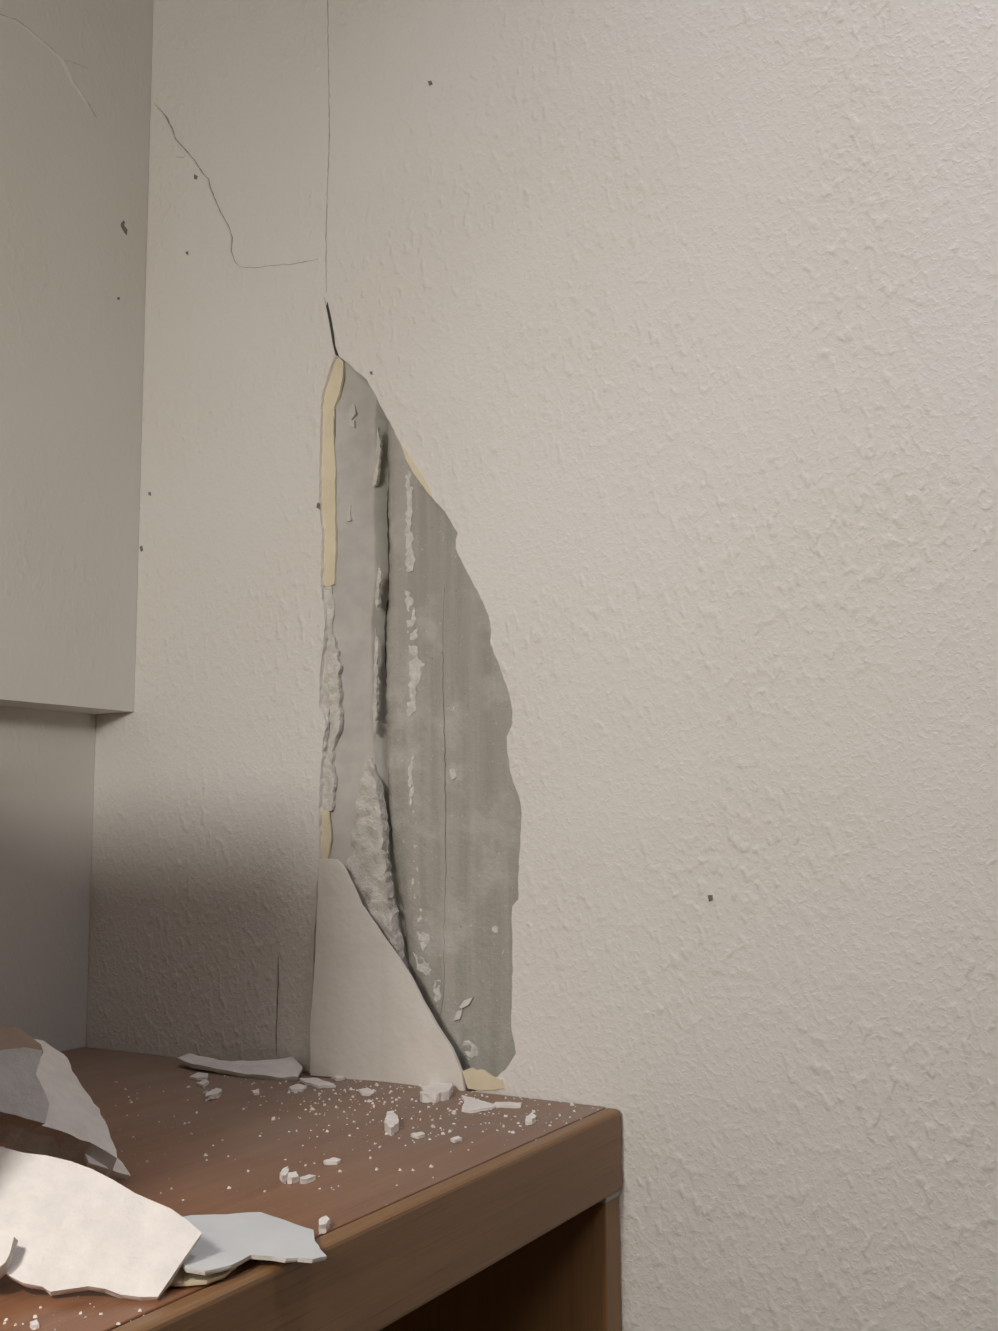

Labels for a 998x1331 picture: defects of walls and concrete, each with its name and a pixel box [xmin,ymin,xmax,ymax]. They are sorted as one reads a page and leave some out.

crack [152,0,339,357]
spalling [316,357,536,1125]
spalling [384,1110,425,1139]